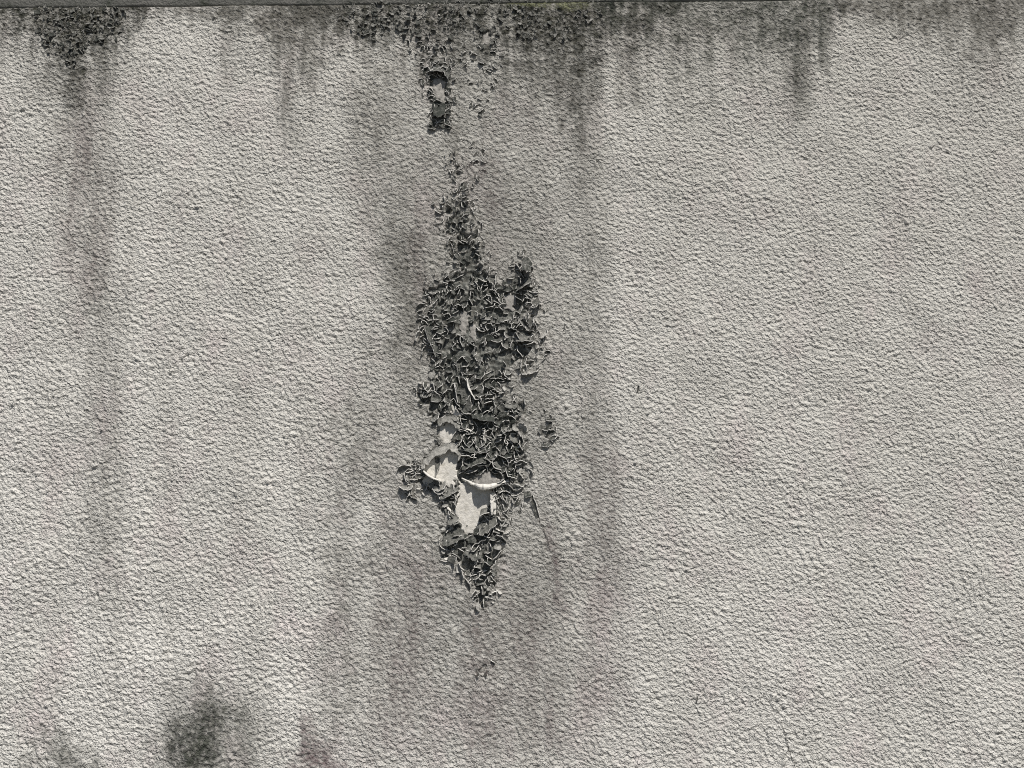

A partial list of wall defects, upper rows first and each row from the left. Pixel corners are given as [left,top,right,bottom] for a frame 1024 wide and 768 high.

peeling [335,0,603,129]
peeling [397,143,559,611]